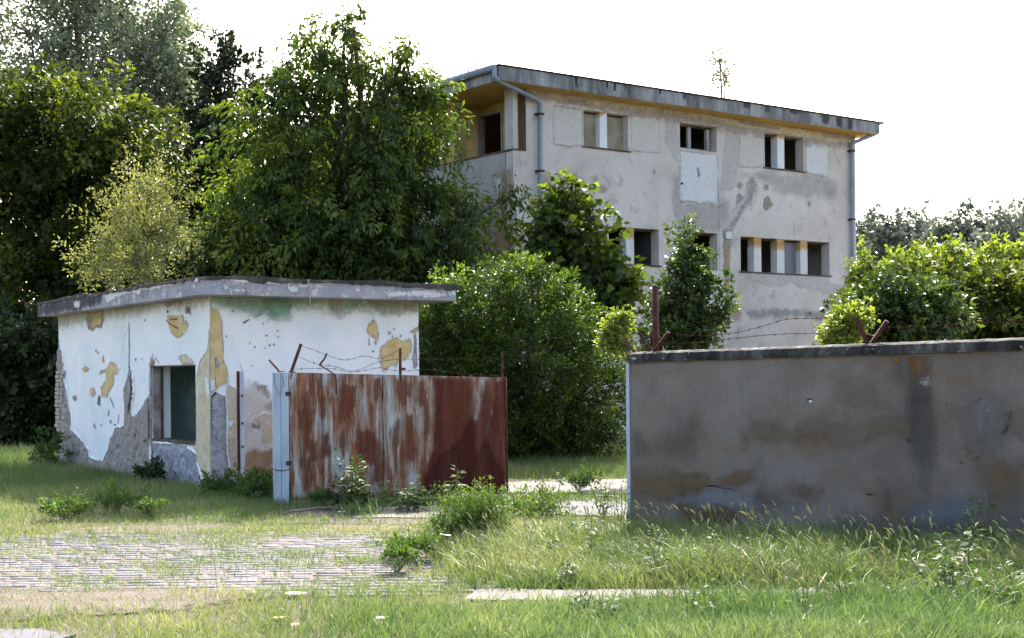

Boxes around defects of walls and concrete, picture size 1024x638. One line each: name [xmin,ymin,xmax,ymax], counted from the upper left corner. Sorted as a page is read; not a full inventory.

peeling [73,278,199,338]
spalling [55,299,237,486]
peeling [253,382,273,449]
corrosion [300,385,383,491]
peeling [365,319,419,372]
corrosion [394,377,505,497]